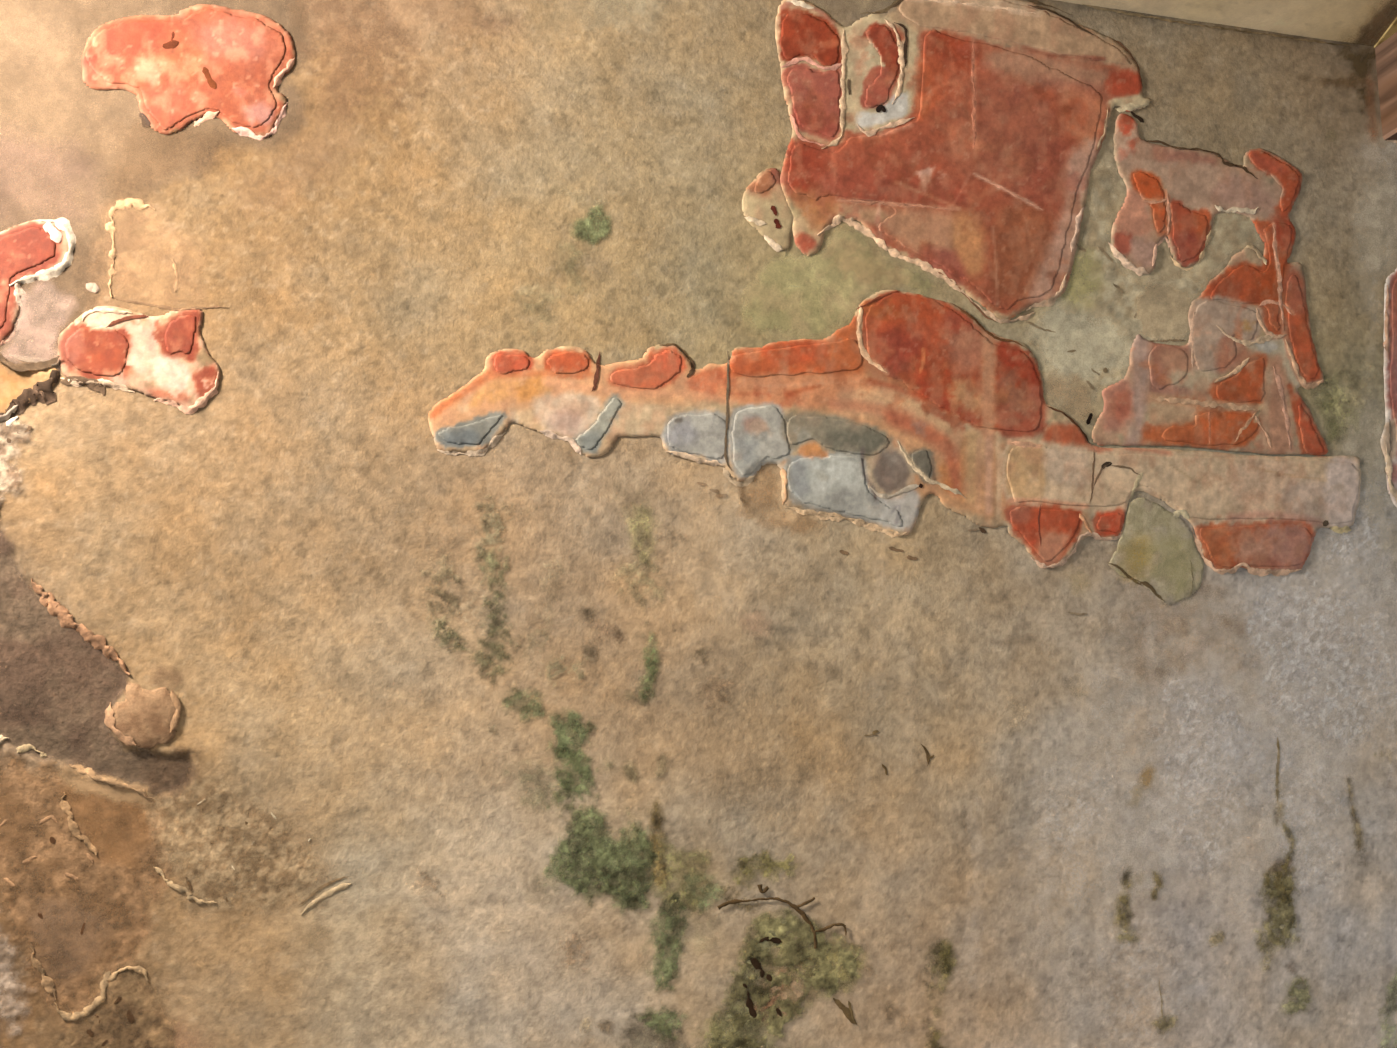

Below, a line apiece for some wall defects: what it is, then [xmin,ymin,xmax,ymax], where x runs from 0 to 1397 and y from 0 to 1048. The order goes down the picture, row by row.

water stain [0,0,311,363]
peeling [86,197,228,311]
peeling [7,283,70,366]
spalling [0,405,32,443]
spalling [697,467,812,531]
water stain [0,943,27,1034]